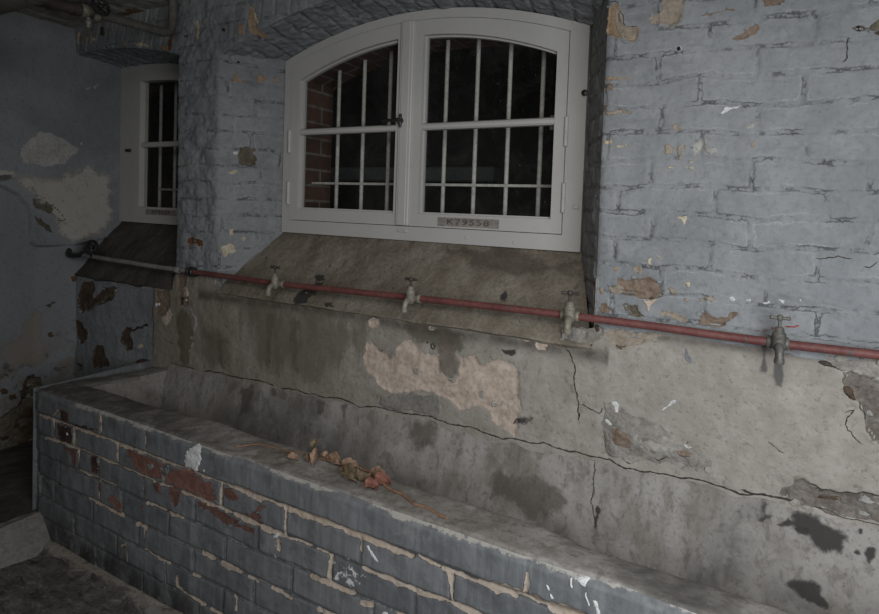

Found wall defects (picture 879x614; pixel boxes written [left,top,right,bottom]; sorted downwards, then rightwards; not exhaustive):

flaking render [71,276,117,345]
flaking render [560,324,662,350]
peeling [599,255,740,327]
flaking render [363,340,525,437]
crack [157,330,793,530]
flaking render [818,355,879,444]
crack [845,401,866,445]
peeling [125,449,265,534]
damp [761,504,846,552]
flaking render [780,478,879,522]
crack [809,483,879,525]
damp [788,580,829,609]